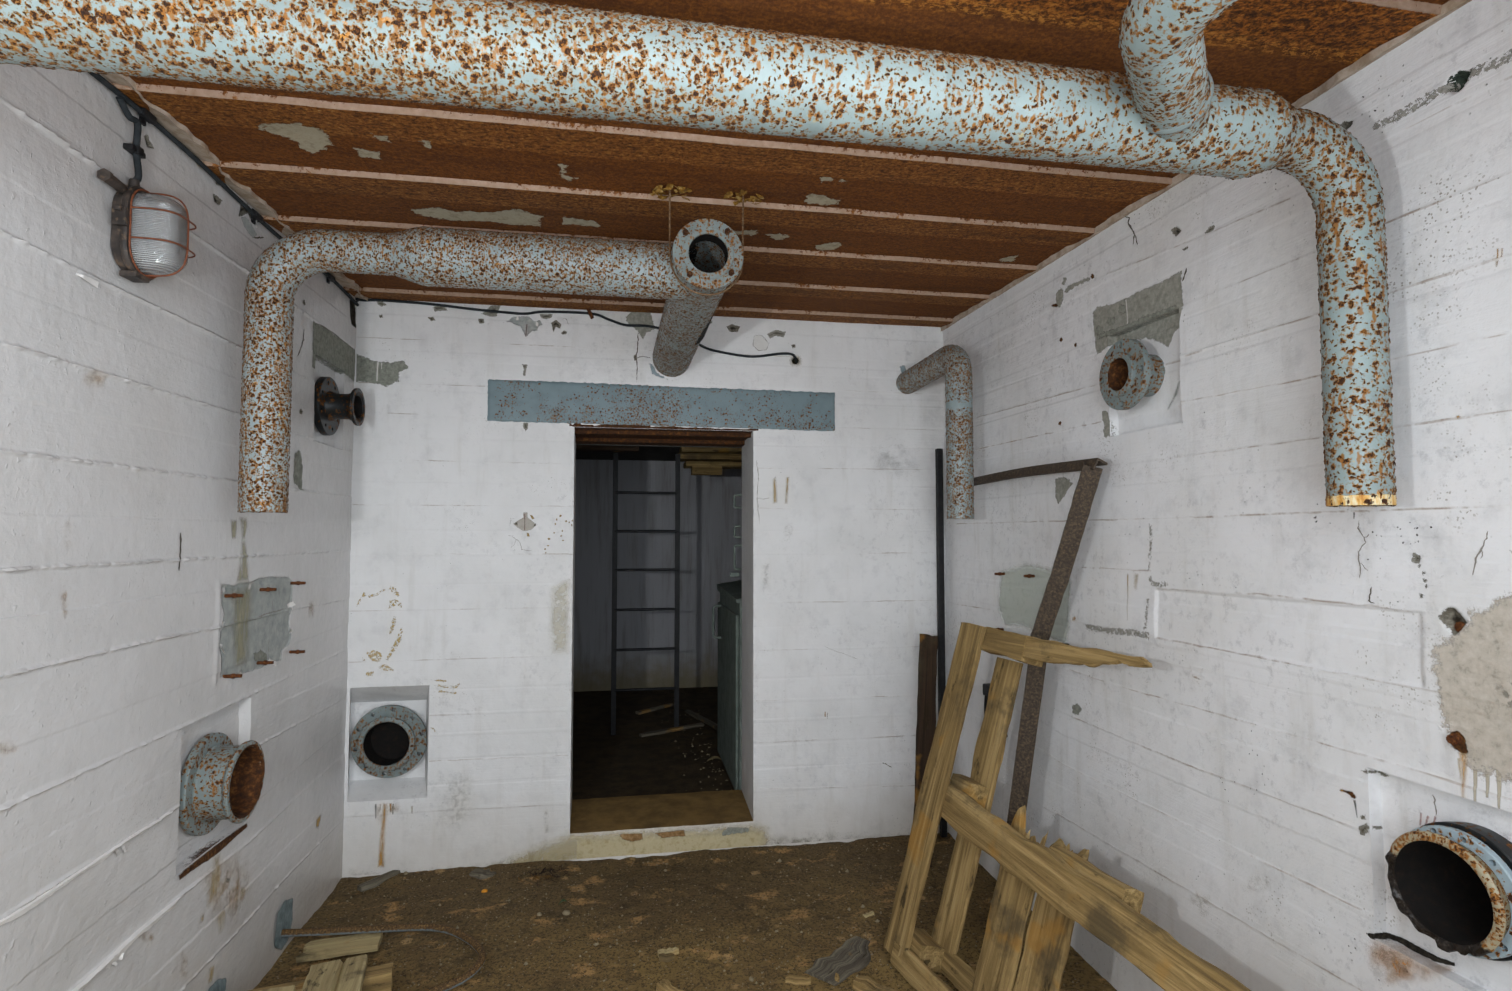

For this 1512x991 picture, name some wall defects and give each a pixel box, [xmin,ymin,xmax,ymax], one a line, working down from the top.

peeling [258,123,335,154]
peeling [411,207,544,226]
peeling [562,217,600,228]
peeling [312,321,408,387]
spalling [1438,607,1467,636]
rust [1451,731,1468,787]